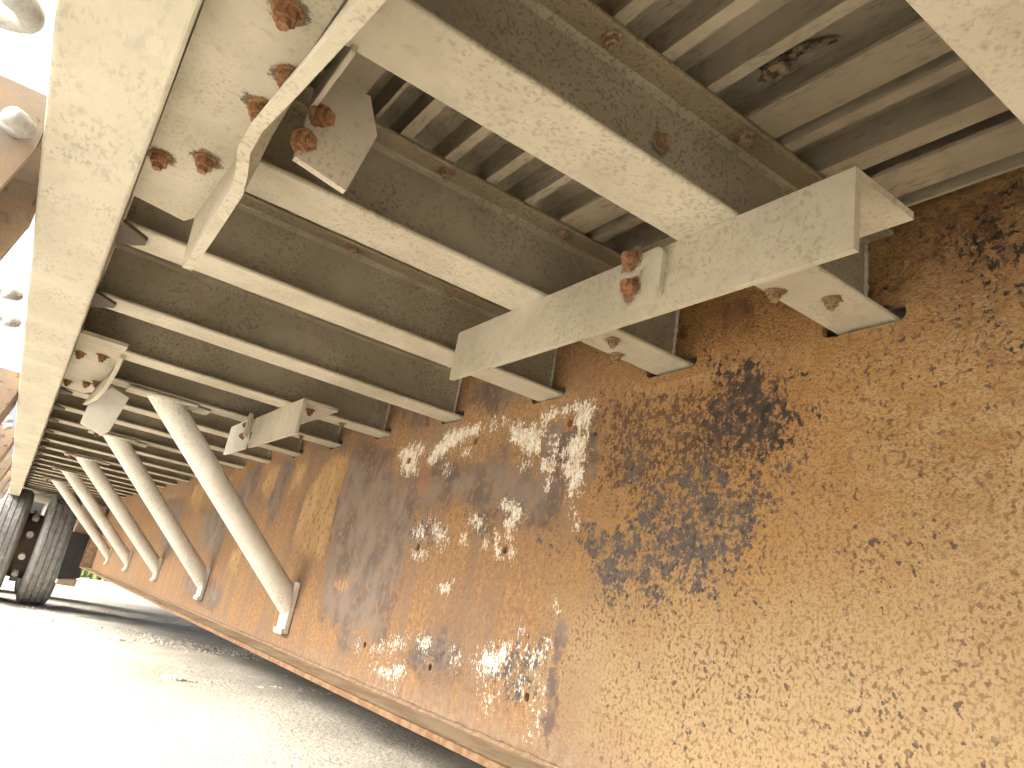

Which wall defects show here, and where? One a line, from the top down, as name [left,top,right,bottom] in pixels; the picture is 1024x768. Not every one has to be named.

corrosion [939,180,1024,355]
corrosion [190,480,204,516]
corrosion [261,461,282,504]
corrosion [286,445,354,597]
corrosion [571,290,823,626]
corrosion [540,614,569,752]